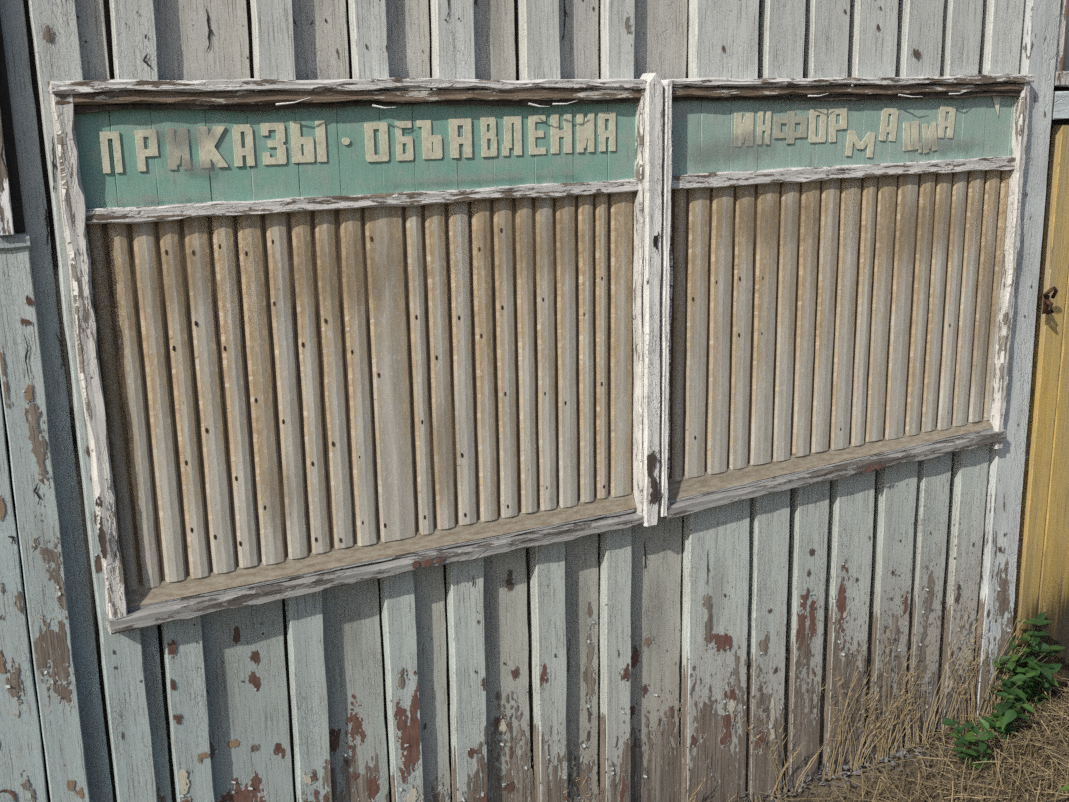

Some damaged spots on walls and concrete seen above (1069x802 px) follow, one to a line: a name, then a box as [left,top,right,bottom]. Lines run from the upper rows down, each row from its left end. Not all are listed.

peeling [22,374,50,521]
peeling [647,451,659,505]
peeling [0,535,74,717]
peeling [167,637,177,660]
peeling [232,625,242,644]
peeling [241,650,261,692]
peeling [302,533,1021,802]
damp [1019,589,1069,696]
peeling [18,769,35,802]
peeling [66,776,85,799]
peeling [157,739,285,802]